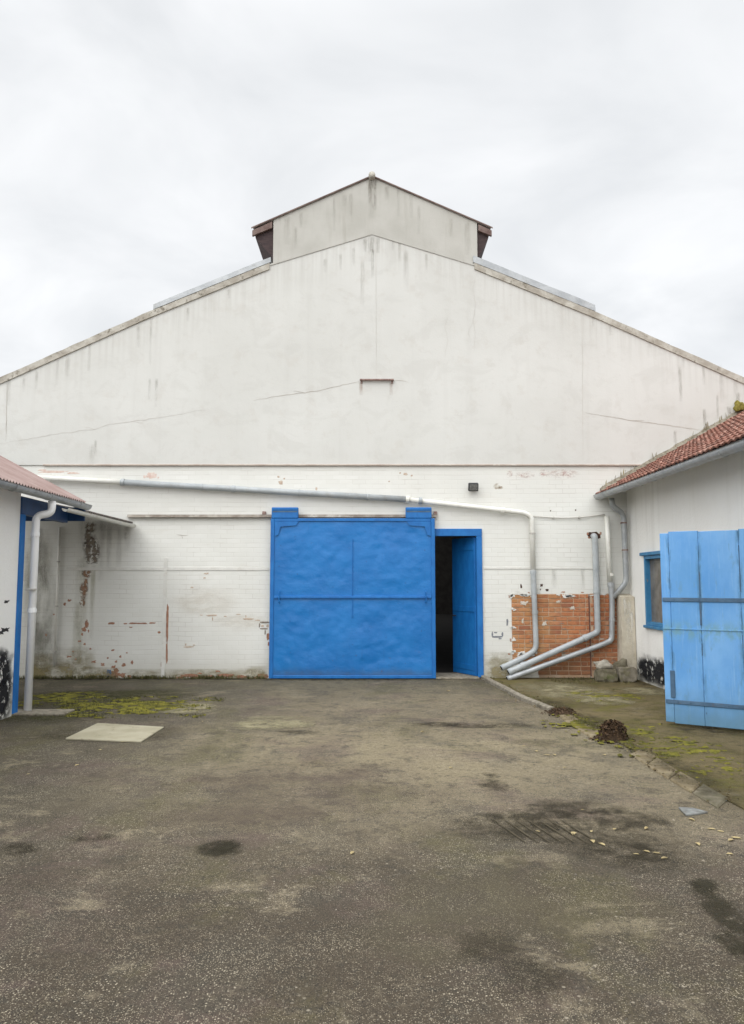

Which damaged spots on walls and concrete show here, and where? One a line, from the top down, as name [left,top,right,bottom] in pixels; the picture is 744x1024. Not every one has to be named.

crack [253,305,406,401]
crack [582,342,697,430]
crack [6,404,202,441]
spalling [67,620,134,678]
peeling [108,604,169,663]
spalling [200,614,269,646]
flaking render [508,584,621,678]